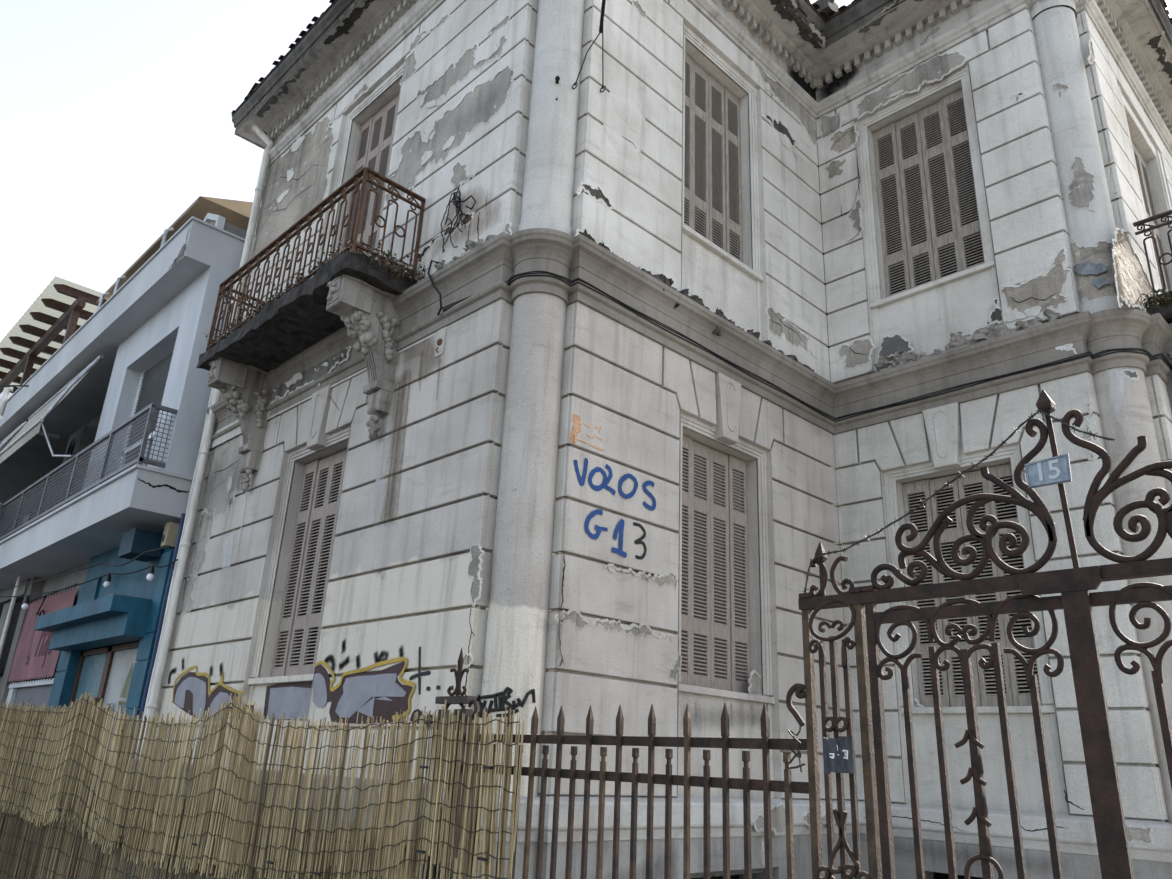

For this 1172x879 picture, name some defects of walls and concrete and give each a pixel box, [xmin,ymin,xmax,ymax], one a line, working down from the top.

peeling [251,83,370,275]
peeling [384,13,516,204]
peeling [746,50,967,242]
peeling [1067,156,1096,212]
spalling [1144,31,1172,87]
peeling [837,228,1155,375]
crack [138,478,190,493]
crack [465,610,475,705]
crack [558,552,566,667]